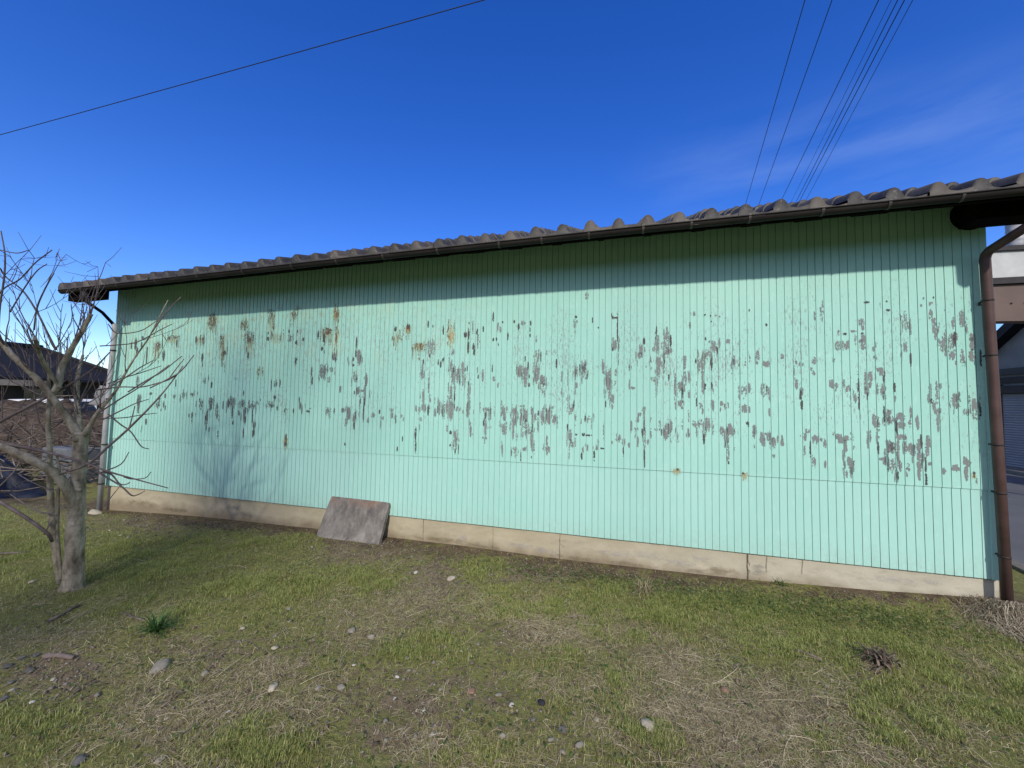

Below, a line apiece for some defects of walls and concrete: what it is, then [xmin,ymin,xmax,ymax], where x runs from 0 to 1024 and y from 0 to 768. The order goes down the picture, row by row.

rust [320,305,339,353]
rust [392,324,425,360]
peeling [886,300,912,366]
peeling [920,296,982,367]
peeling [136,354,311,439]
peeling [311,311,784,468]
peeling [731,350,816,410]
peeling [800,318,982,485]